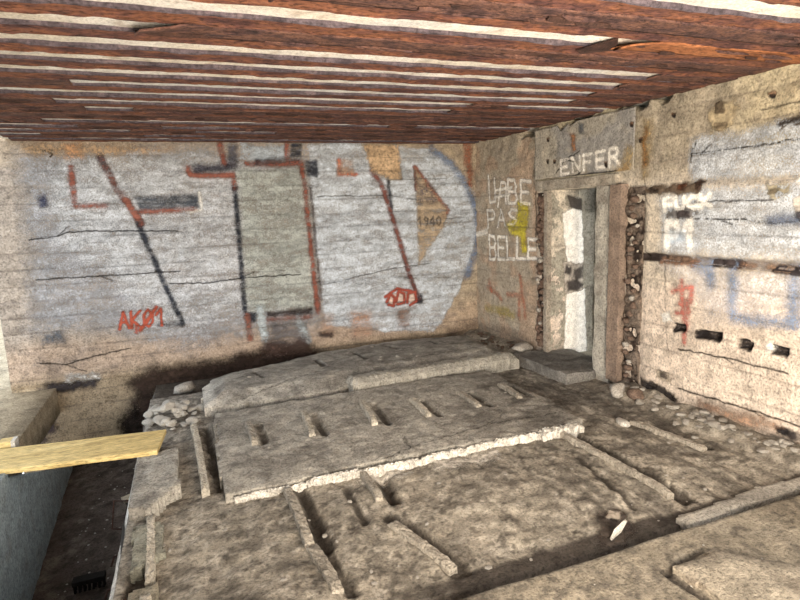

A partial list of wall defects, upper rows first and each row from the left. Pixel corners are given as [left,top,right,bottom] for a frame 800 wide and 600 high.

peeling [0,0,800,141]
spalling [766,183,800,219]
crack [29,230,178,240]
crack [39,348,131,372]